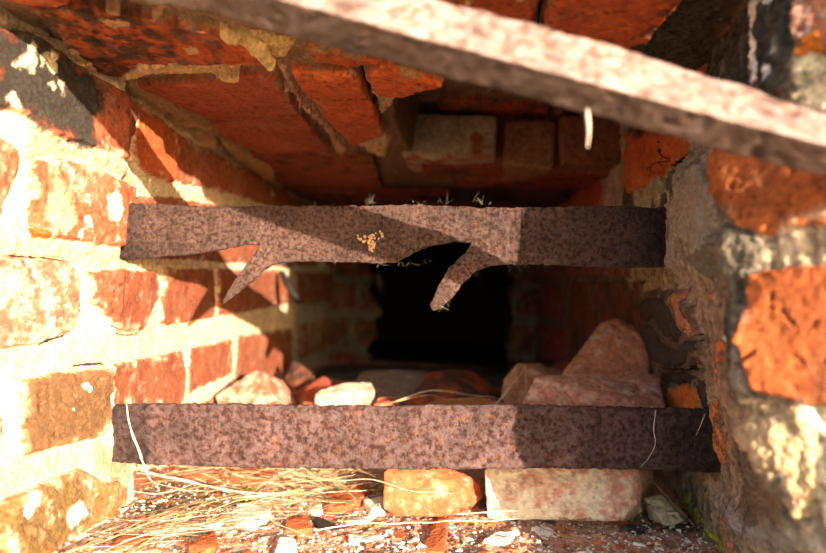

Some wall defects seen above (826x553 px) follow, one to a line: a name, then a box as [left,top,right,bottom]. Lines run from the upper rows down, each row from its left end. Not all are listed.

peeling [12,39,98,92]
water stain [748,0,759,82]
peeling [4,92,22,118]